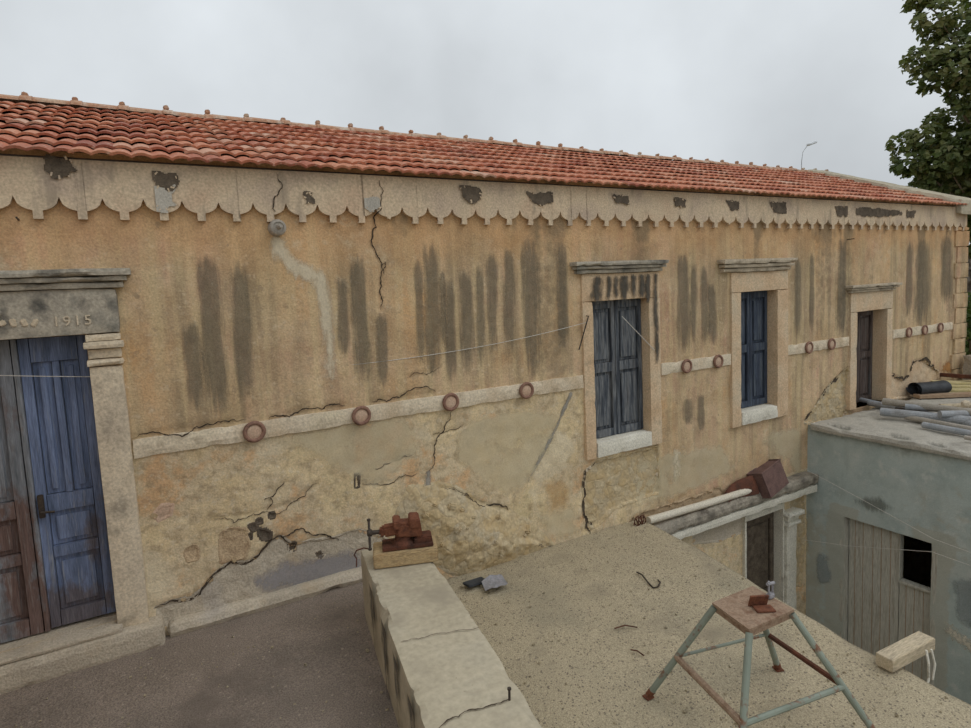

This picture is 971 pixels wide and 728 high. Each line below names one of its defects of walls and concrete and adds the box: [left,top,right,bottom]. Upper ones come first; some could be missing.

water stain [272,236,387,379]
crack [371,181,386,310]
spalling [459,185,482,204]
water stain [415,247,537,369]
spalling [526,191,553,207]
water stain [559,250,568,338]
water stain [678,258,716,343]
crack [373,367,440,402]
spalling [891,359,940,400]
crack [362,412,508,510]
crack [155,483,339,608]
spalling [154,511,388,628]